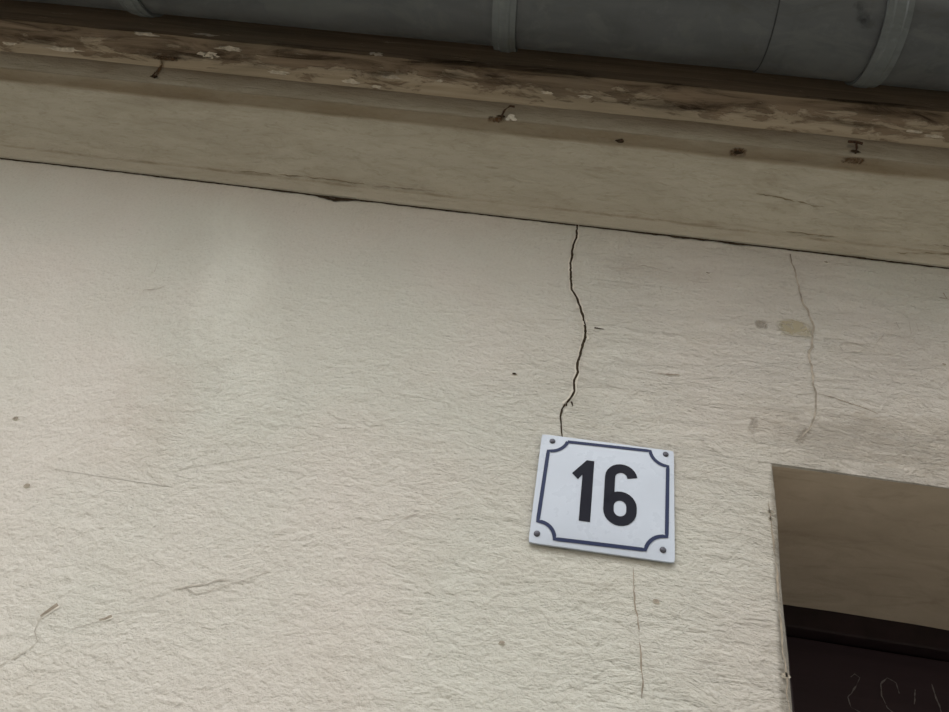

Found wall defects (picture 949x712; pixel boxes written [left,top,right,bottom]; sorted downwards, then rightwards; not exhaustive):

crack [0,158,949,439]
crack [72,568,290,629]
crack [633,570,644,698]